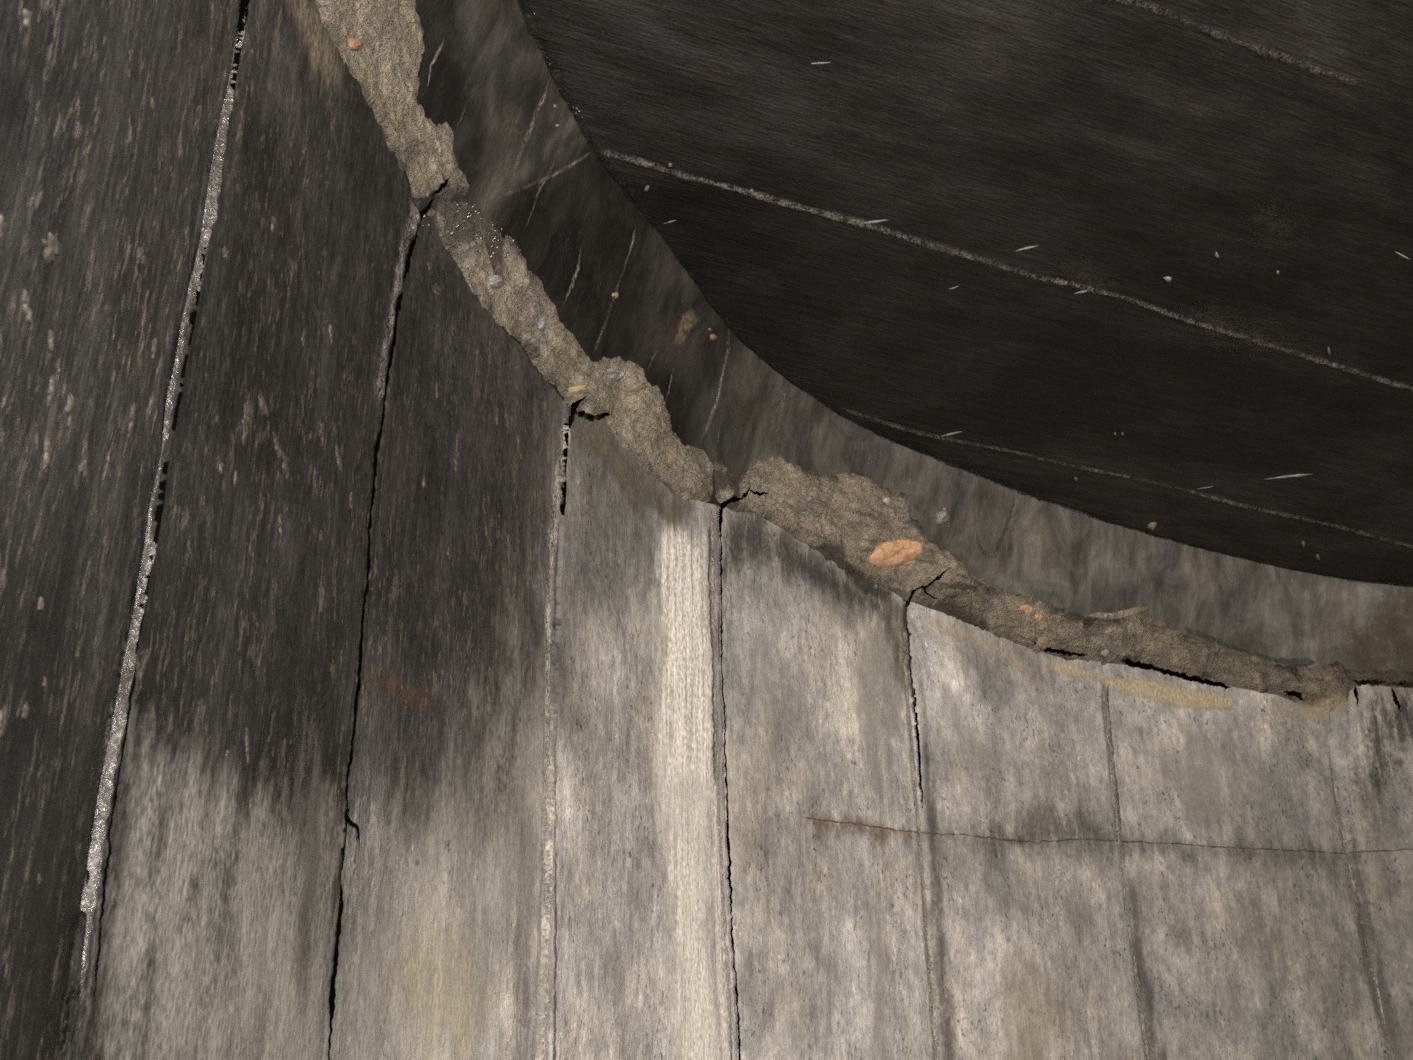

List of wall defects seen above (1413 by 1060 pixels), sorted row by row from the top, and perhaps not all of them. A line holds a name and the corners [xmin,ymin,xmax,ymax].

crack [328,175,451,1060]
crack [708,486,768,1060]
crack [804,569,1413,862]